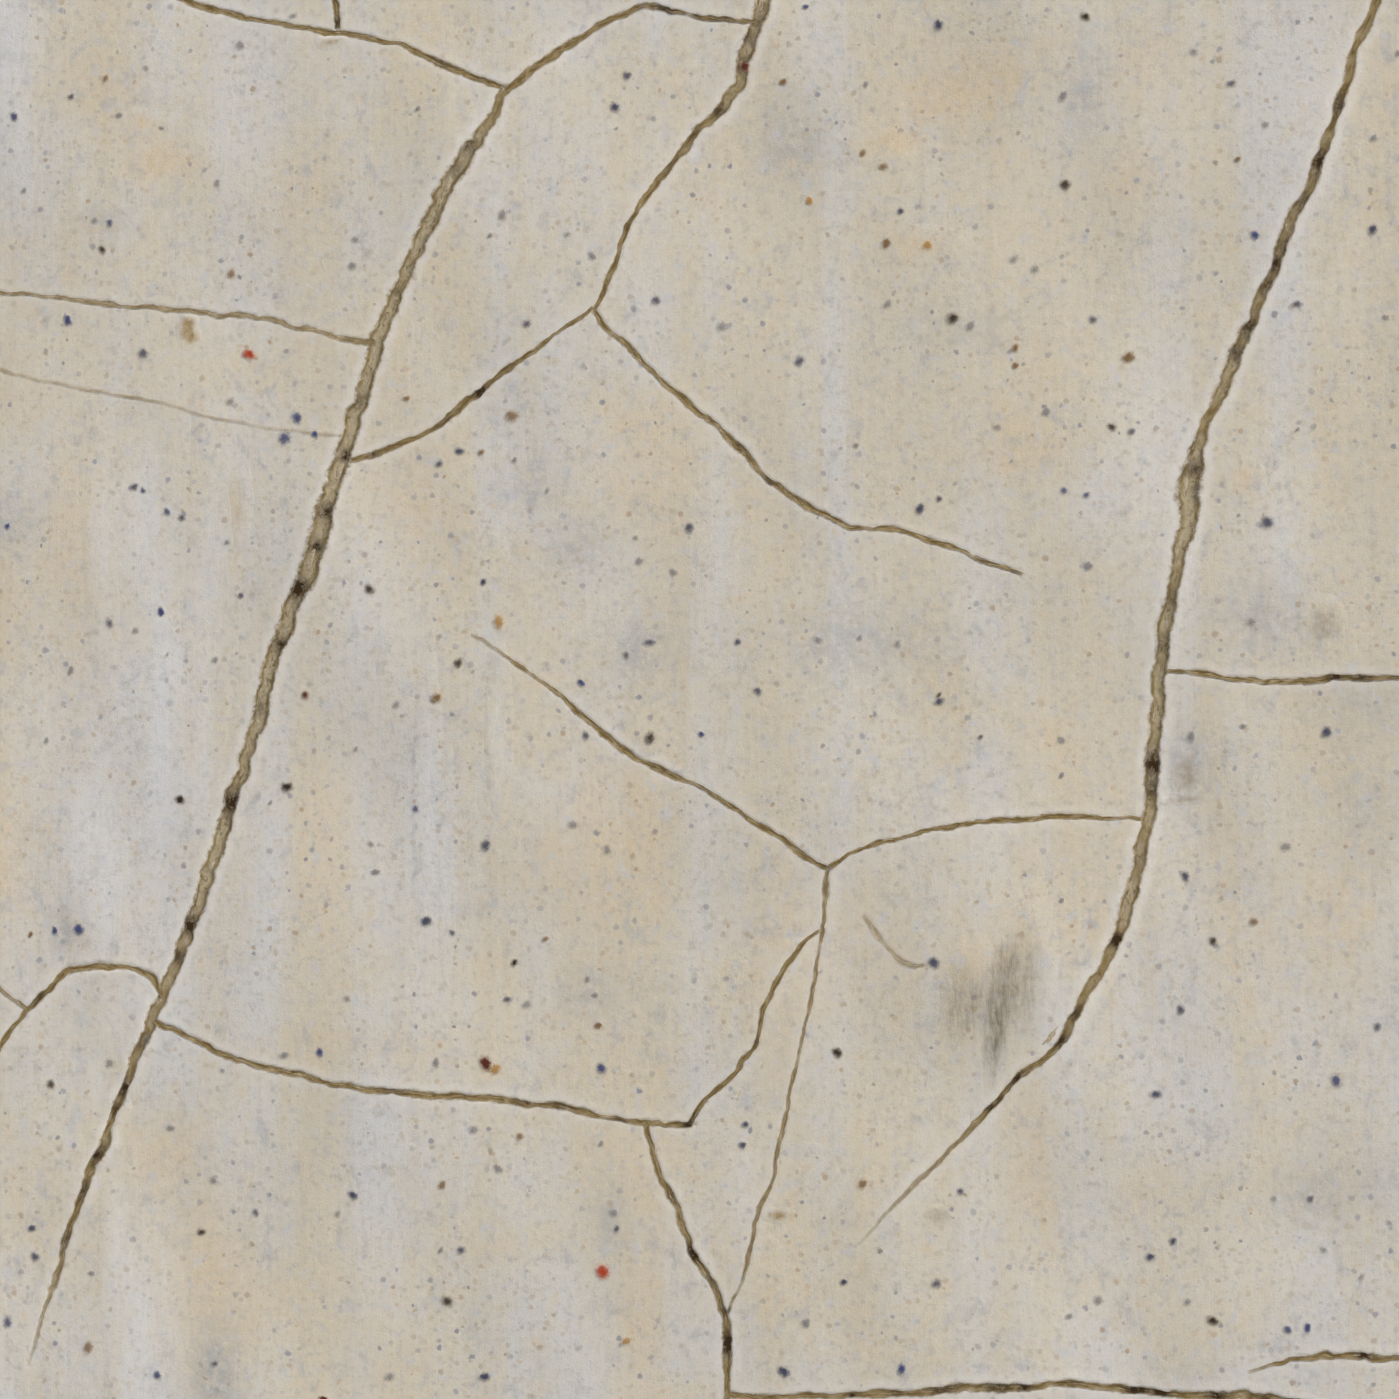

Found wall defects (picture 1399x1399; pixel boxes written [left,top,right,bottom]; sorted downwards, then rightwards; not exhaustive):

crack [0,0,1023,1325]
crack [499,0,1399,1204]
crack [644,1122,1299,1399]
crack [1251,1350,1399,1371]